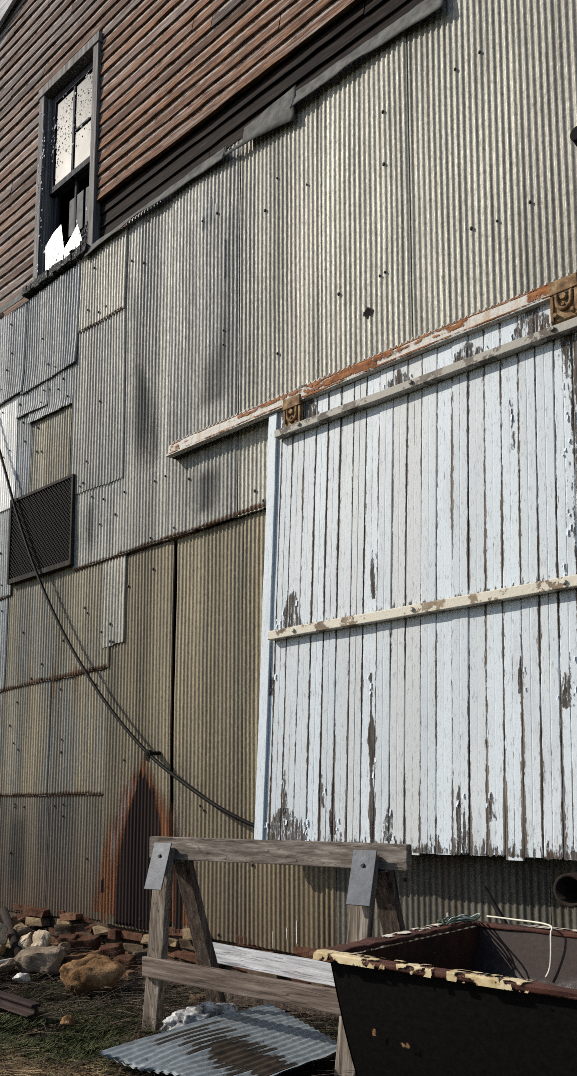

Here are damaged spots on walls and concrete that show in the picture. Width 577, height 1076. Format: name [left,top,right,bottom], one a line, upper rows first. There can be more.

peeling [303,397,319,420]
rust [195,280,577,439]
peeling [382,369,411,390]
peeling [452,342,486,363]
peeling [509,308,551,340]
peeling [558,332,577,577]
peeling [275,590,334,630]
peeling [370,553,462,612]
peeling [556,652,576,709]
peeling [264,672,577,861]
rust [94,756,177,930]
rust [170,867,189,933]